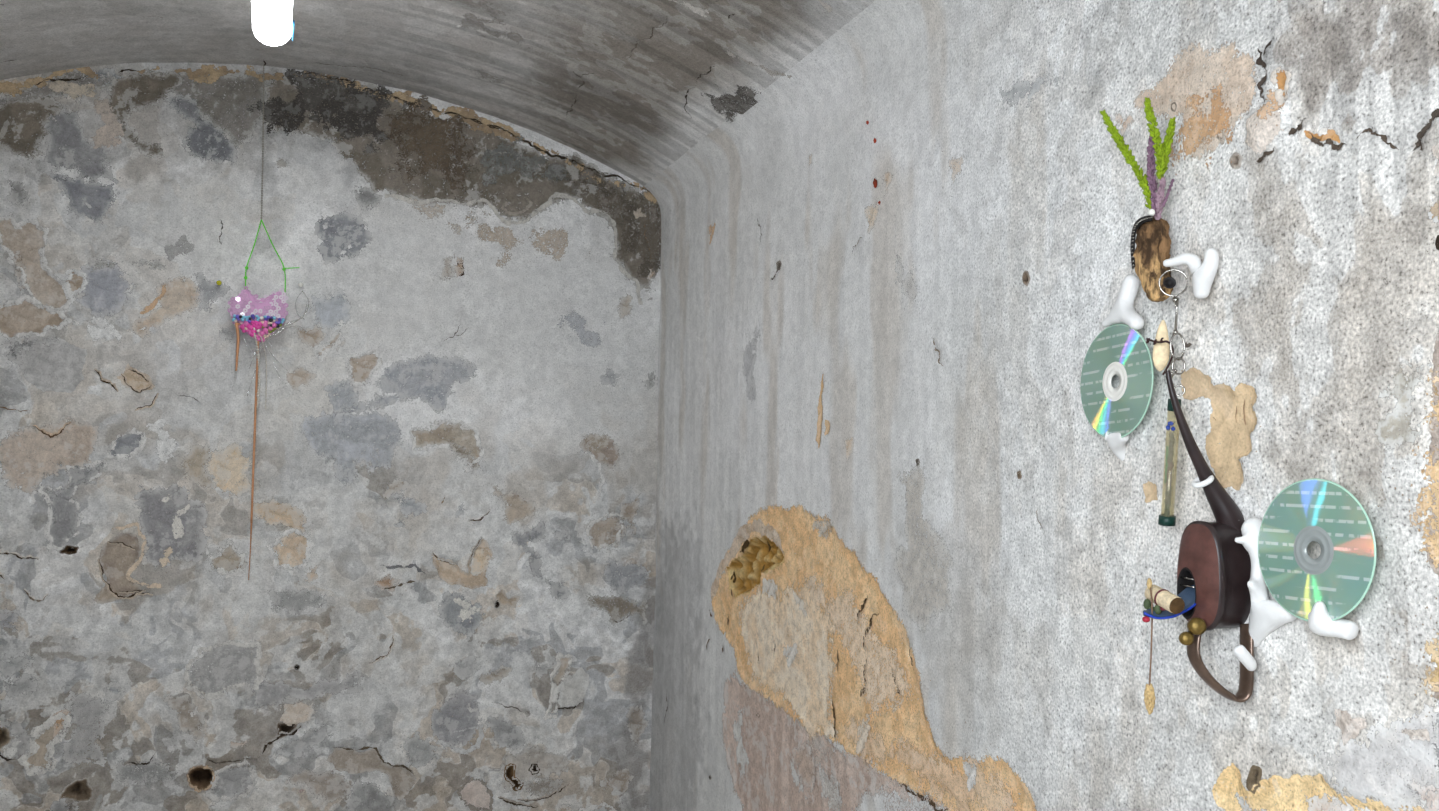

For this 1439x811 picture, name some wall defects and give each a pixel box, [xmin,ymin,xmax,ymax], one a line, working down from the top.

peeling [1128,19,1292,179]
crack [1256,40,1272,105]
crack [1257,108,1439,163]
damp [0,63,661,305]
spalling [1181,358,1261,502]
peeling [1378,333,1439,576]
crack [0,550,48,602]
spalling [374,539,520,609]
peeling [711,492,1044,811]
spalling [0,727,12,749]
spalling [59,778,93,802]
peeling [1210,763,1425,811]